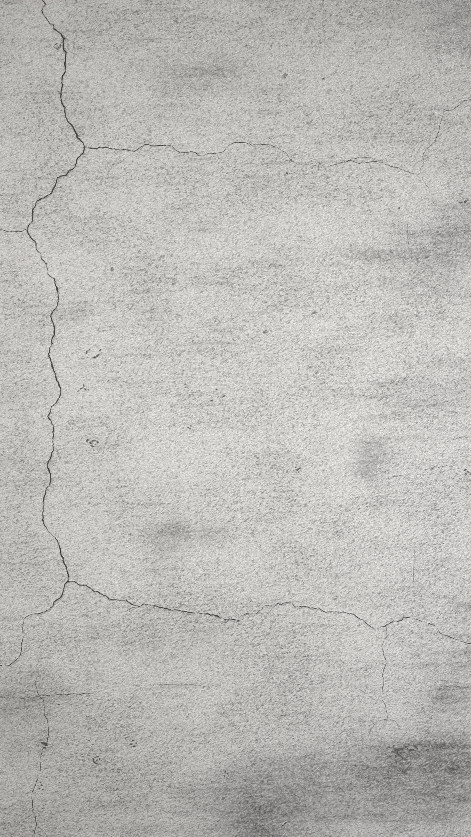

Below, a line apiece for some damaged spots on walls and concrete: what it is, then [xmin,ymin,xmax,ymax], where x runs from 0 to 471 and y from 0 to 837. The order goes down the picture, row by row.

crack [330,99,471,193]
crack [0,0,435,690]
crack [2,678,84,833]